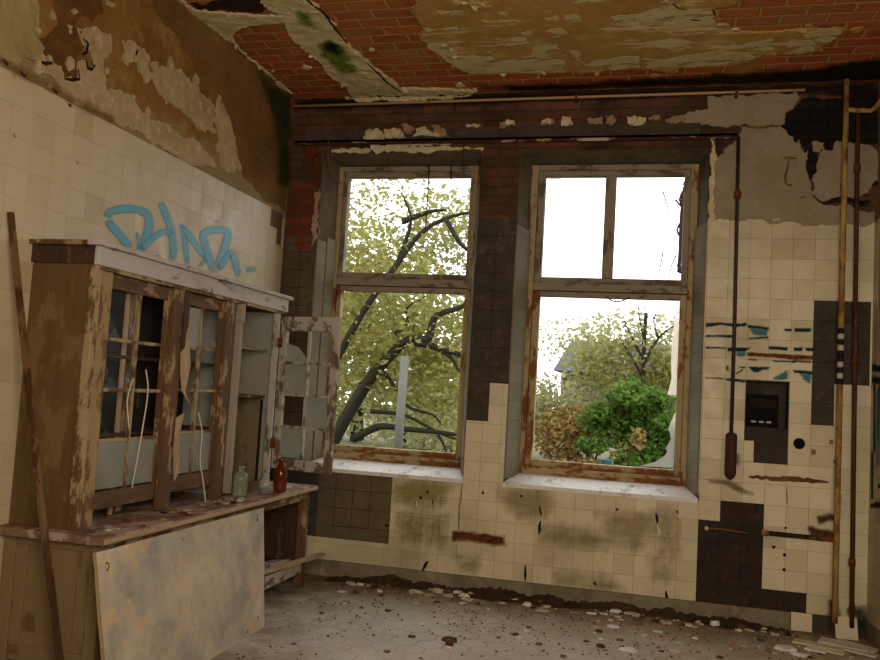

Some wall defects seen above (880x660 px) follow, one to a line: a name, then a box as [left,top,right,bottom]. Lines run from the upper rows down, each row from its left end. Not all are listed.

crack [307,0,348,44]
crack [367,63,401,92]
peeling [0,0,878,462]